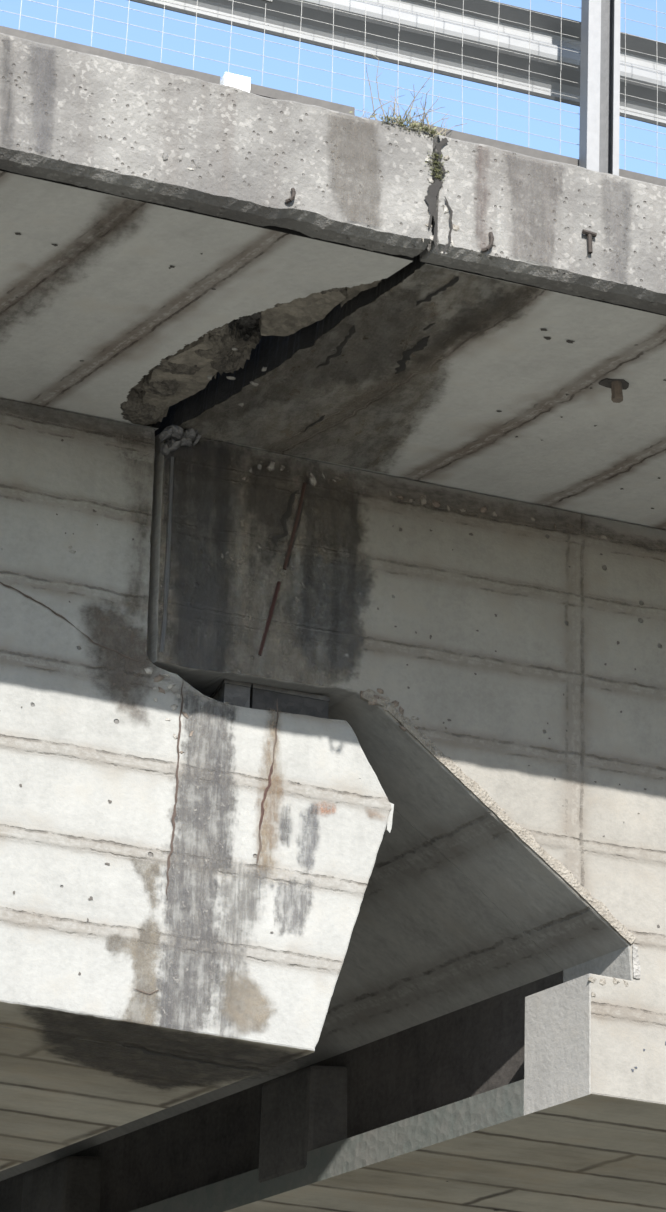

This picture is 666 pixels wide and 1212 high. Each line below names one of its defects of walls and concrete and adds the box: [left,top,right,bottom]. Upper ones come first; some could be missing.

crack [395,137,459,374]
spalling [120,279,382,455]
crack [316,325,356,369]
damp [86,264,584,717]
crack [0,582,145,663]
damp [25,694,311,1089]
crack [166,684,183,899]
crack [256,698,278,864]
damp [280,805,319,867]